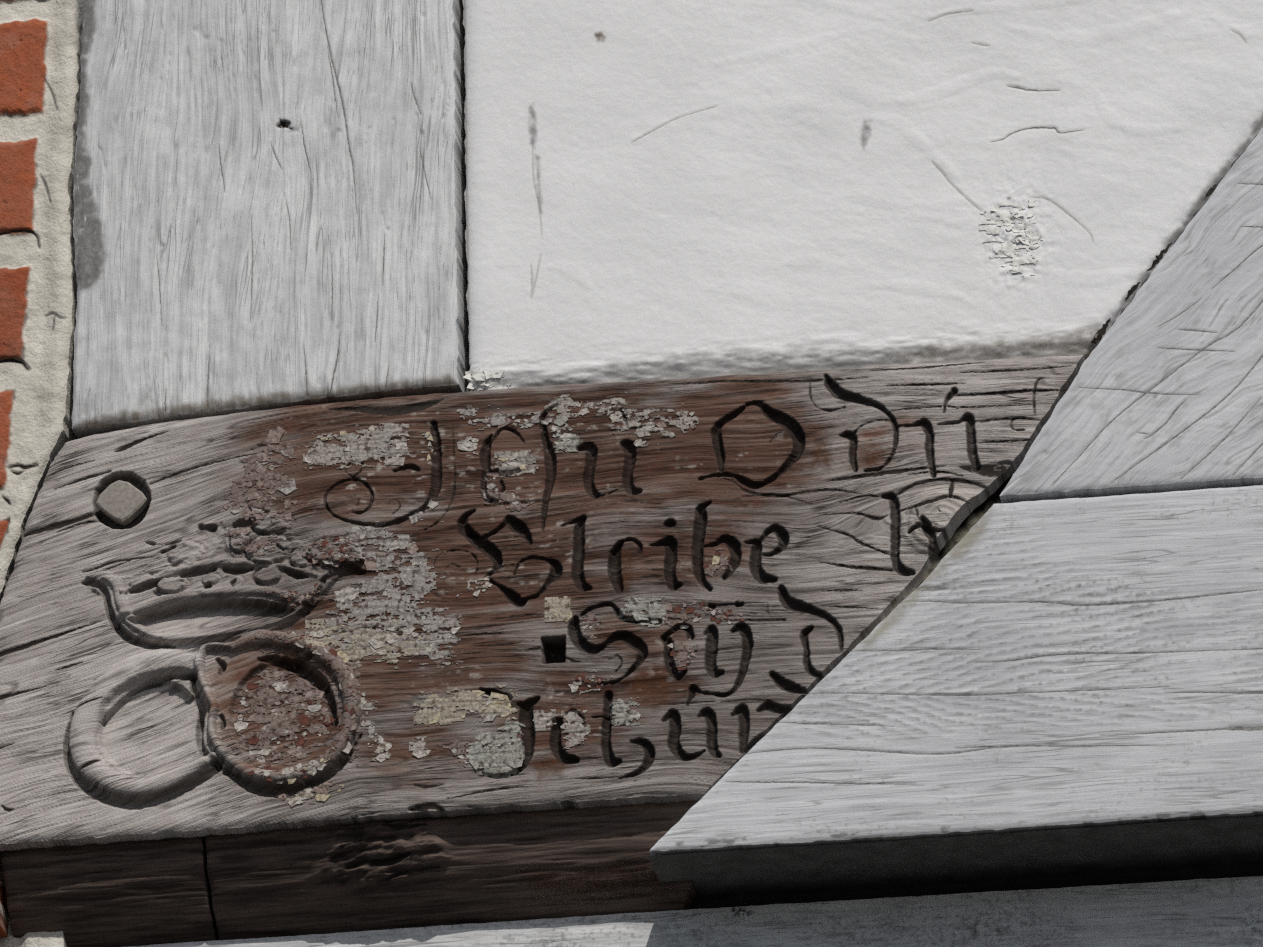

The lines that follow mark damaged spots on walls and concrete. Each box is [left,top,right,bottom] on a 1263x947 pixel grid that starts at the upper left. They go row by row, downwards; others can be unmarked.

spalling [979,196,1044,276]
peeling [457,369,698,456]
peeling [220,422,436,560]
peeling [476,450,538,511]
peeling [228,499,493,807]
peeling [409,684,591,778]
peeling [545,596,602,639]
peeling [568,669,613,695]
peeling [610,697,641,726]
peeling [618,595,745,671]